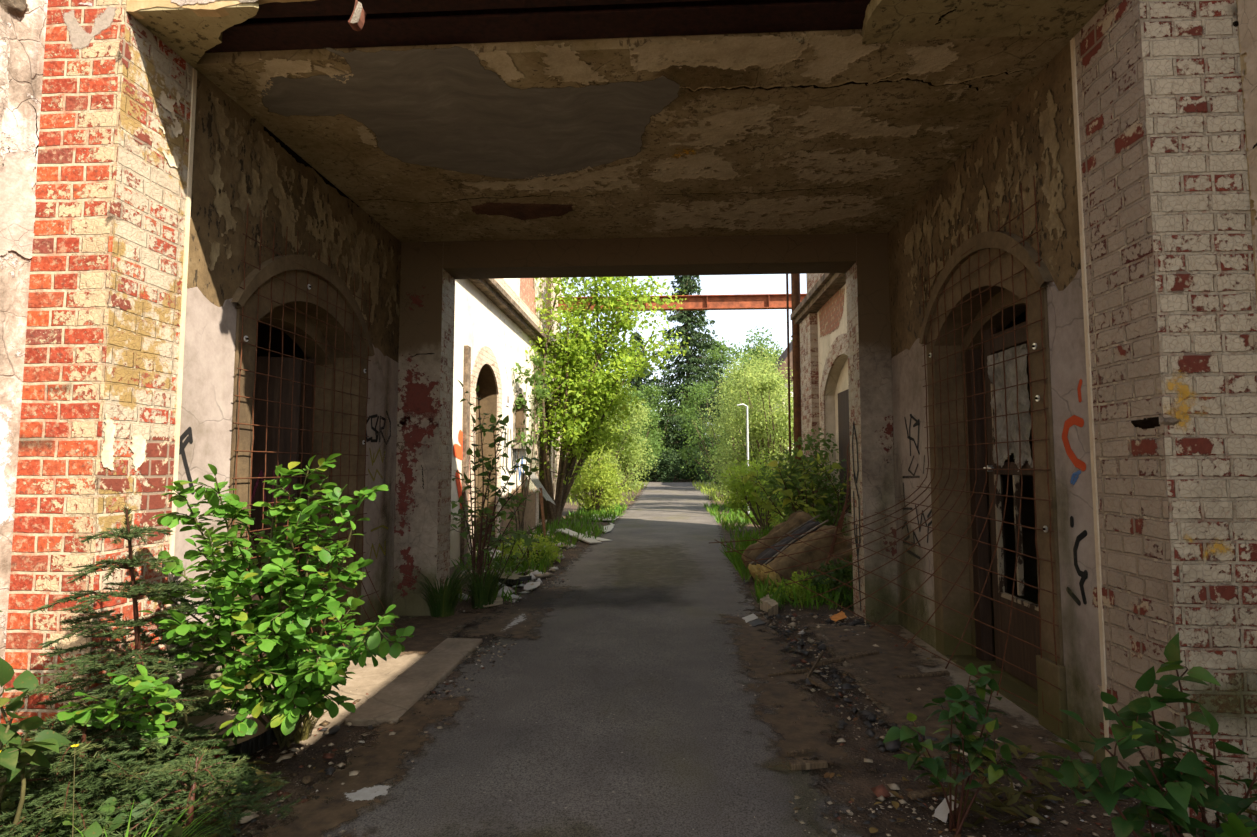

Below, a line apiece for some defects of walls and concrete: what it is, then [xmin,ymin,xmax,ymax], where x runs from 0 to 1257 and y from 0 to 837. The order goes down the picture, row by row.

peeling [255,58,354,97]
peeling [478,50,525,83]
peeling [535,43,609,85]
crack [7,101,39,170]
flaking render [1113,122,1144,154]
peeling [1238,0,1257,279]
peeling [209,92,402,337]
peeling [898,90,1104,308]
flaking render [393,354,442,601]
flaking render [1249,544,1257,561]